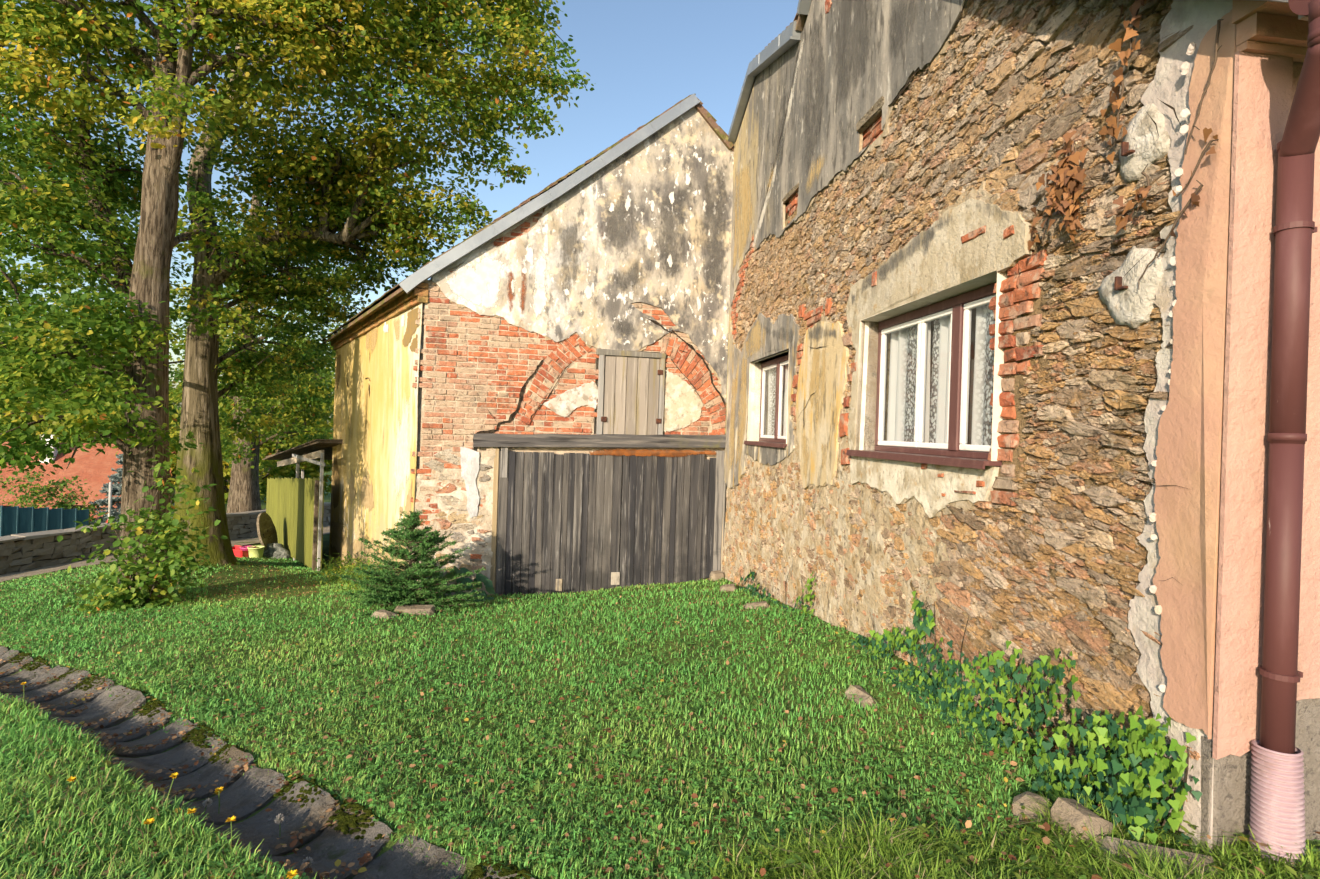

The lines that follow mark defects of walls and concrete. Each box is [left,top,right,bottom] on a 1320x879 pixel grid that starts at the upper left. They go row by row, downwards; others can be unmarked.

leakage [659,0,873,291]
leakage [560,225,580,290]
peeling [594,180,631,212]
leakage [606,201,638,248]
leakage [612,262,638,288]
peeling [644,173,691,212]
peeling [646,230,689,270]
spalling [629,292,726,435]
spalling [330,206,604,596]
crack [473,359,570,436]
spalling [722,0,1253,857]